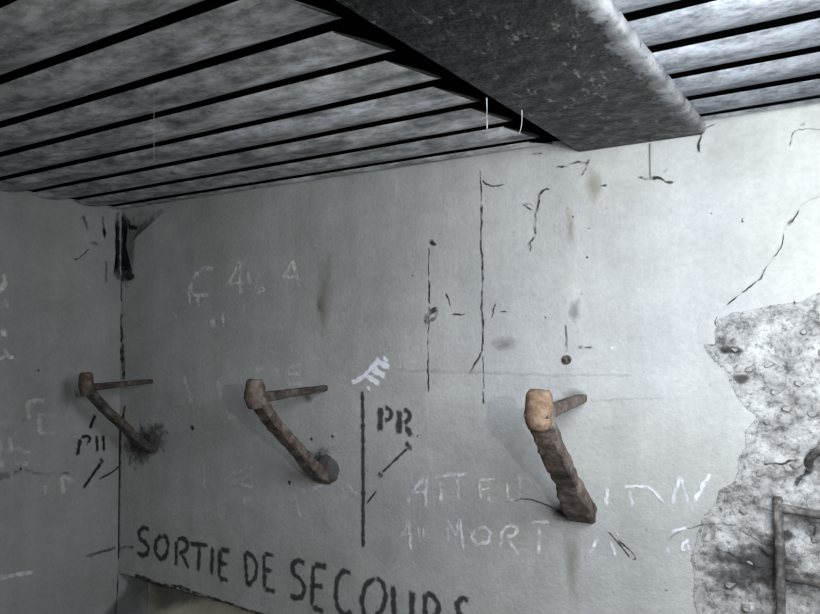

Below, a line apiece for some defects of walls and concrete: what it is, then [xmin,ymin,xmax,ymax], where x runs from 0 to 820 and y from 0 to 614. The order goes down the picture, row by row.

crack [425,174,506,403]
crack [523,188,549,250]
spalling [691,181,820,614]
crack [714,210,799,325]